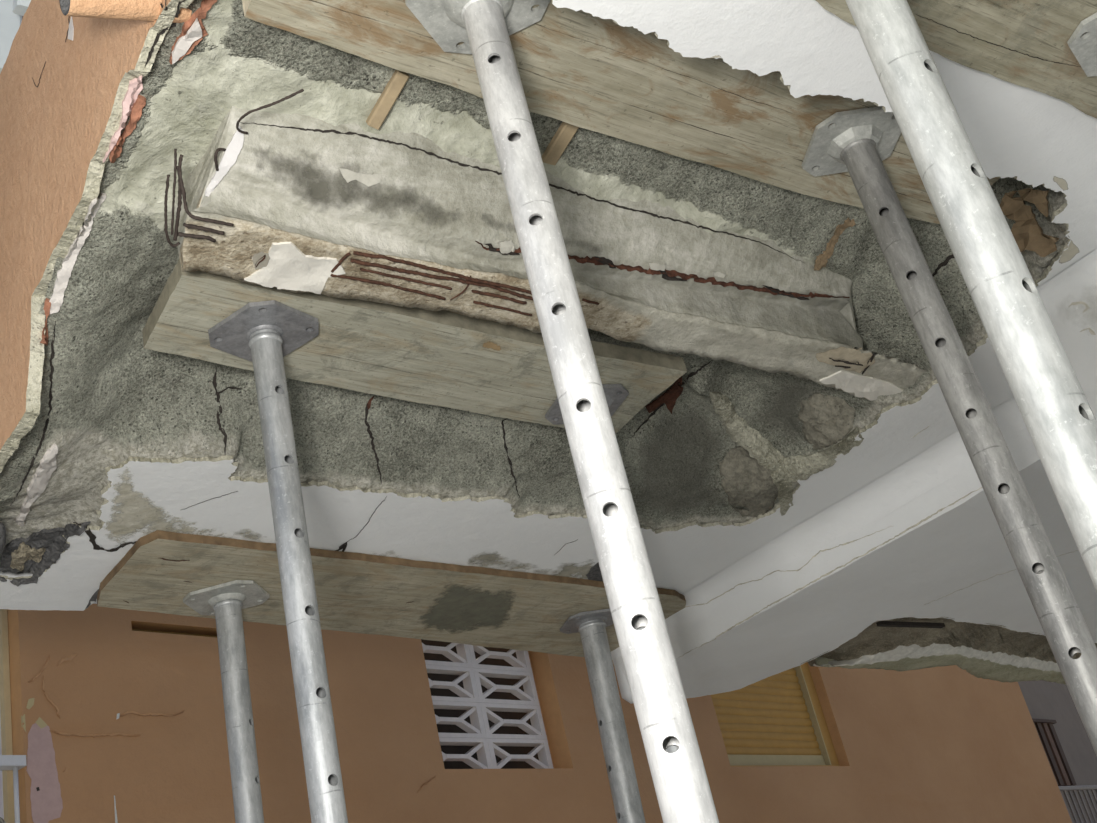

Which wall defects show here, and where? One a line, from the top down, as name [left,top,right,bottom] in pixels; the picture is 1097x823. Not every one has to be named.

peeling [169,0,217,64]
peeling [103,75,146,163]
spalling [205,126,244,197]
peeling [40,192,107,346]
peeling [244,241,533,316]
crack [10,321,56,506]
crack [212,366,242,453]
peeling [816,347,903,401]
spalling [0,444,91,586]
crack [335,396,387,552]
crack [501,418,520,497]
spalling [803,617,1066,685]